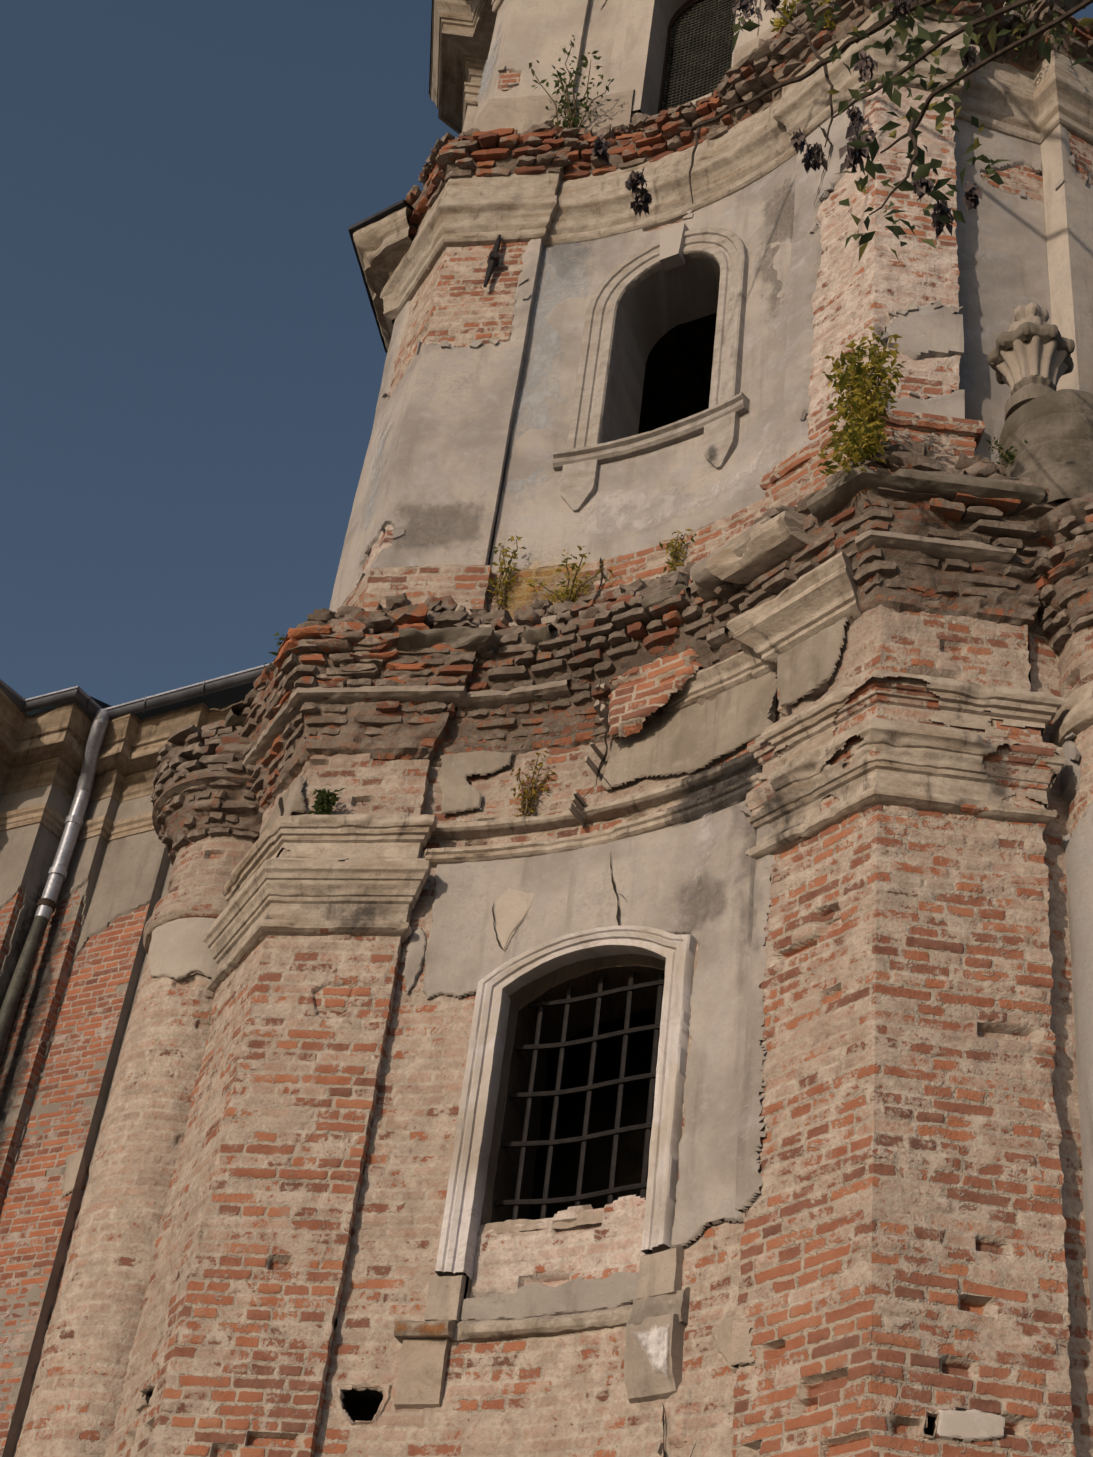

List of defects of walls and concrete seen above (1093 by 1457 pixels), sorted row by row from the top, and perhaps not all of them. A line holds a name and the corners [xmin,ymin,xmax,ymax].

flaking render [981,131,1093,203]
flaking render [797,83,963,440]
flaking render [382,242,531,400]
flaking render [608,648,703,738]
flaking render [1065,725,1093,837]
crack [610,853,626,926]
flaking render [0,888,149,1455]
hole [336,1382,393,1426]
crack [655,1403,696,1457]